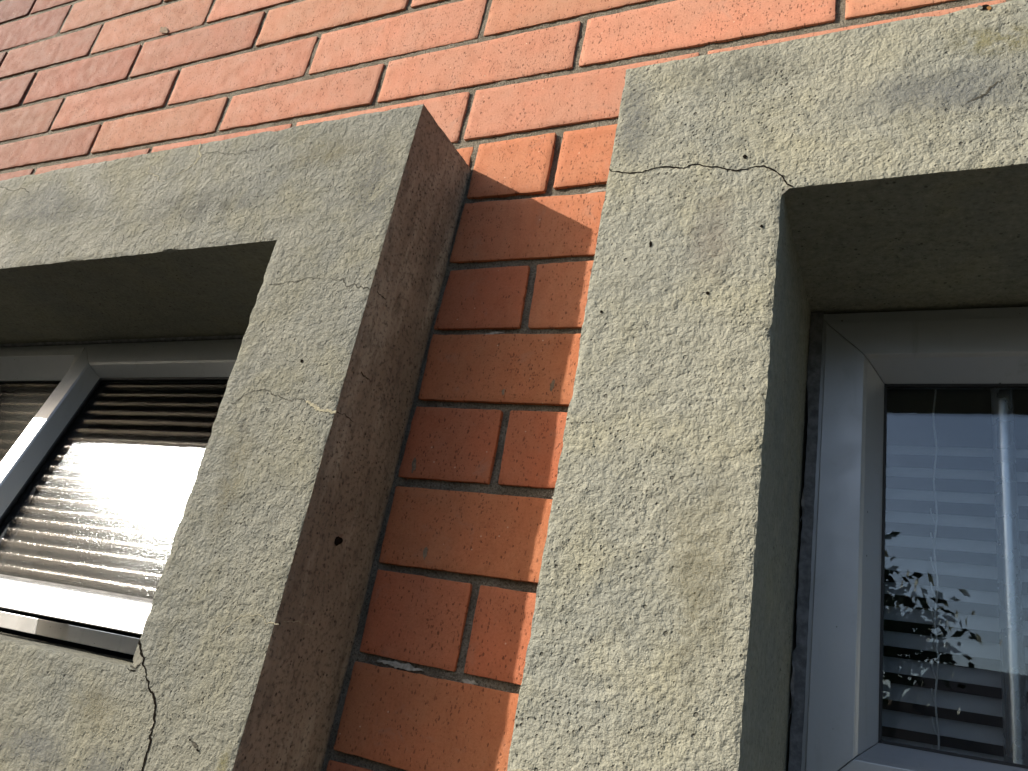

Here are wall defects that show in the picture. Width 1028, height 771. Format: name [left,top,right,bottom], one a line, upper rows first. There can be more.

crack [609,163,793,187]
crack [231,389,353,422]
crack [127,638,156,771]